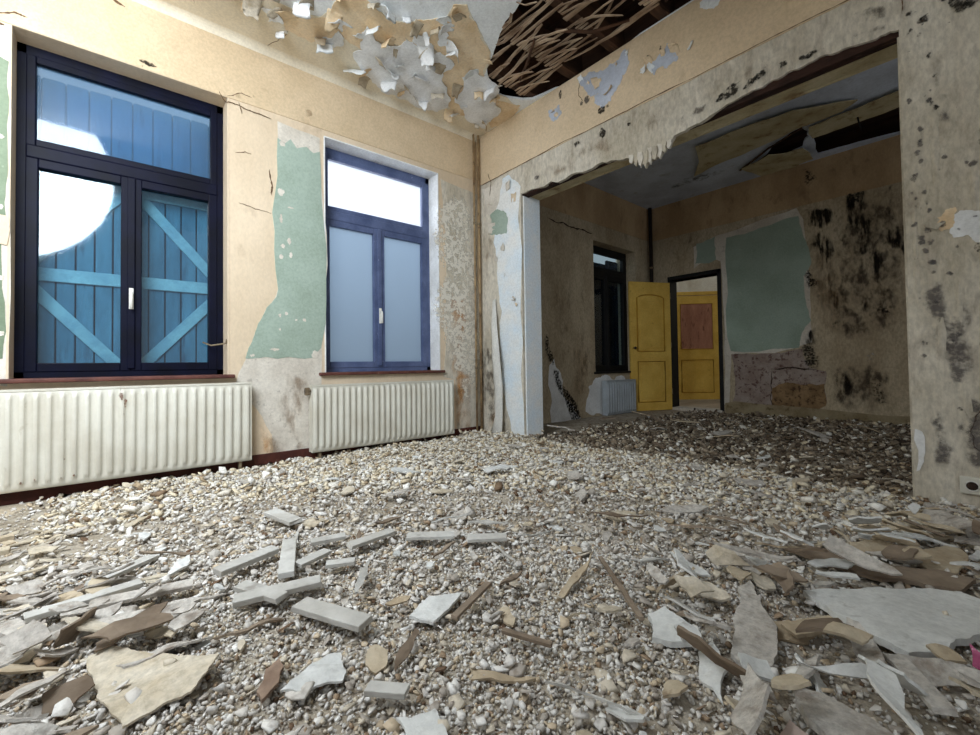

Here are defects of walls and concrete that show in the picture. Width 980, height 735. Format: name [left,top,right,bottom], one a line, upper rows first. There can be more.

leakage [941,0,978,12]
peeling [163,0,568,174]
peeling [577,49,629,107]
peeling [640,40,693,75]
leakage [805,191,953,333]
flaking render [545,336,625,423]
leakage [731,330,888,409]
leakage [926,285,972,382]
leakage [933,419,950,463]
leakage [959,400,980,466]